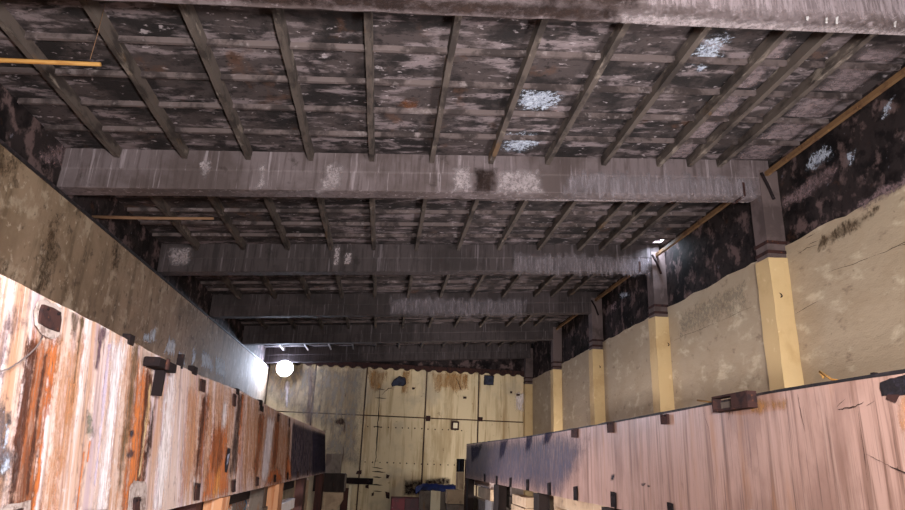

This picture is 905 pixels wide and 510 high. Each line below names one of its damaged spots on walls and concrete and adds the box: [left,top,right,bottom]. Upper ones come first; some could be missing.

leakage [818,206,879,251]
rust [8,330,84,510]
rust [115,343,154,510]
rust [182,389,291,501]